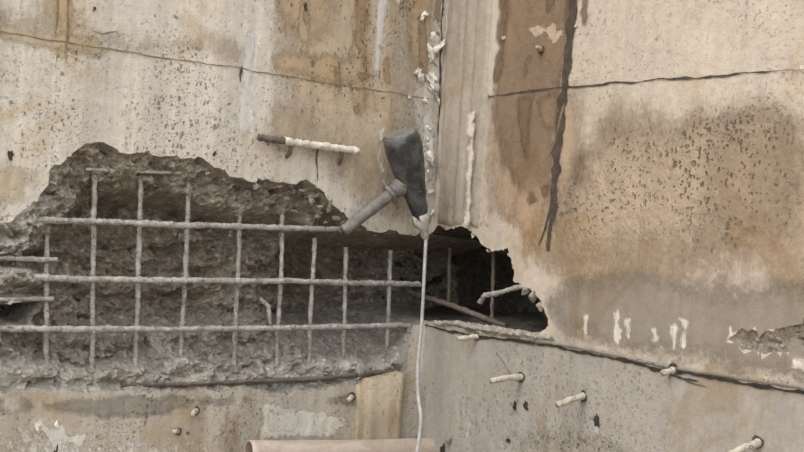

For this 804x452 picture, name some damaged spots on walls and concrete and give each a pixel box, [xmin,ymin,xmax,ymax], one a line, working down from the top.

crack [0,0,444,136]
crack [490,69,804,97]
water stain [464,111,475,225]
water stain [486,0,804,383]
spalling [0,142,564,440]
crack [425,324,804,394]
spalling [729,321,804,354]
peeling [0,424,220,452]